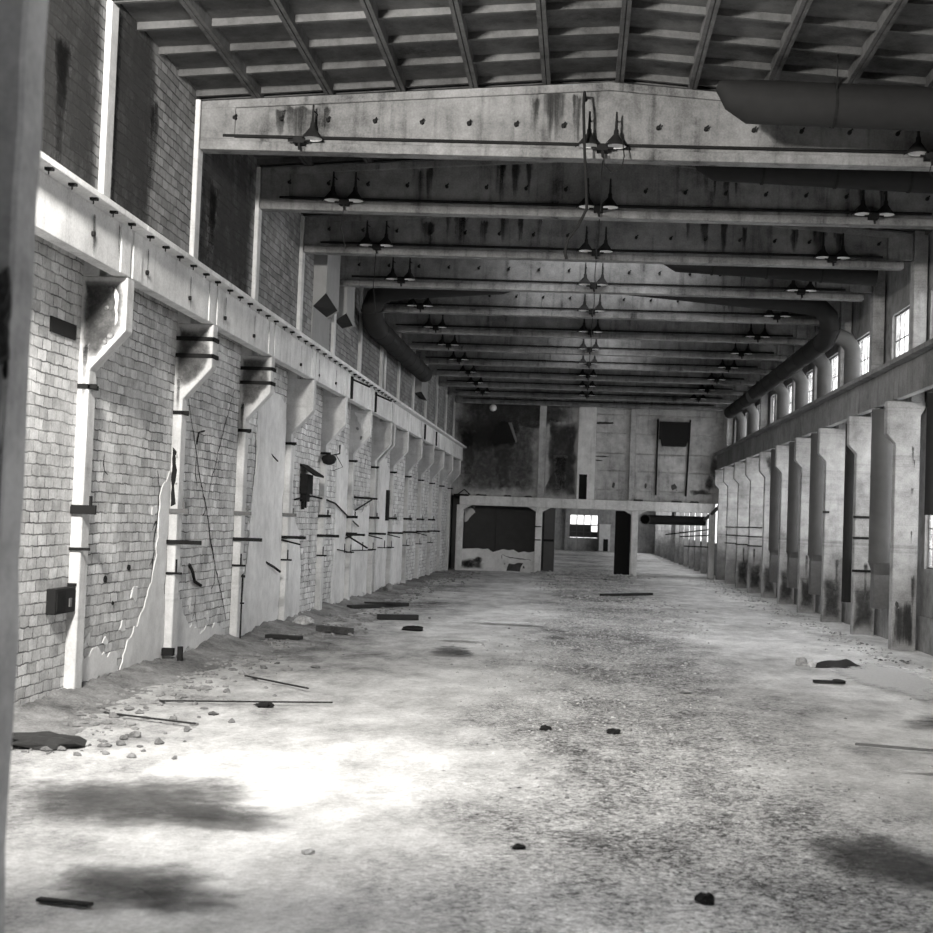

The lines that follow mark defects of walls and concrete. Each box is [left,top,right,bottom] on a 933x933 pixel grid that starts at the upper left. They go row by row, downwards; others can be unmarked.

damp [534,93,581,132]
damp [497,164,532,190]
flaking render [82,448,178,682]
flaking render [176,595,226,654]